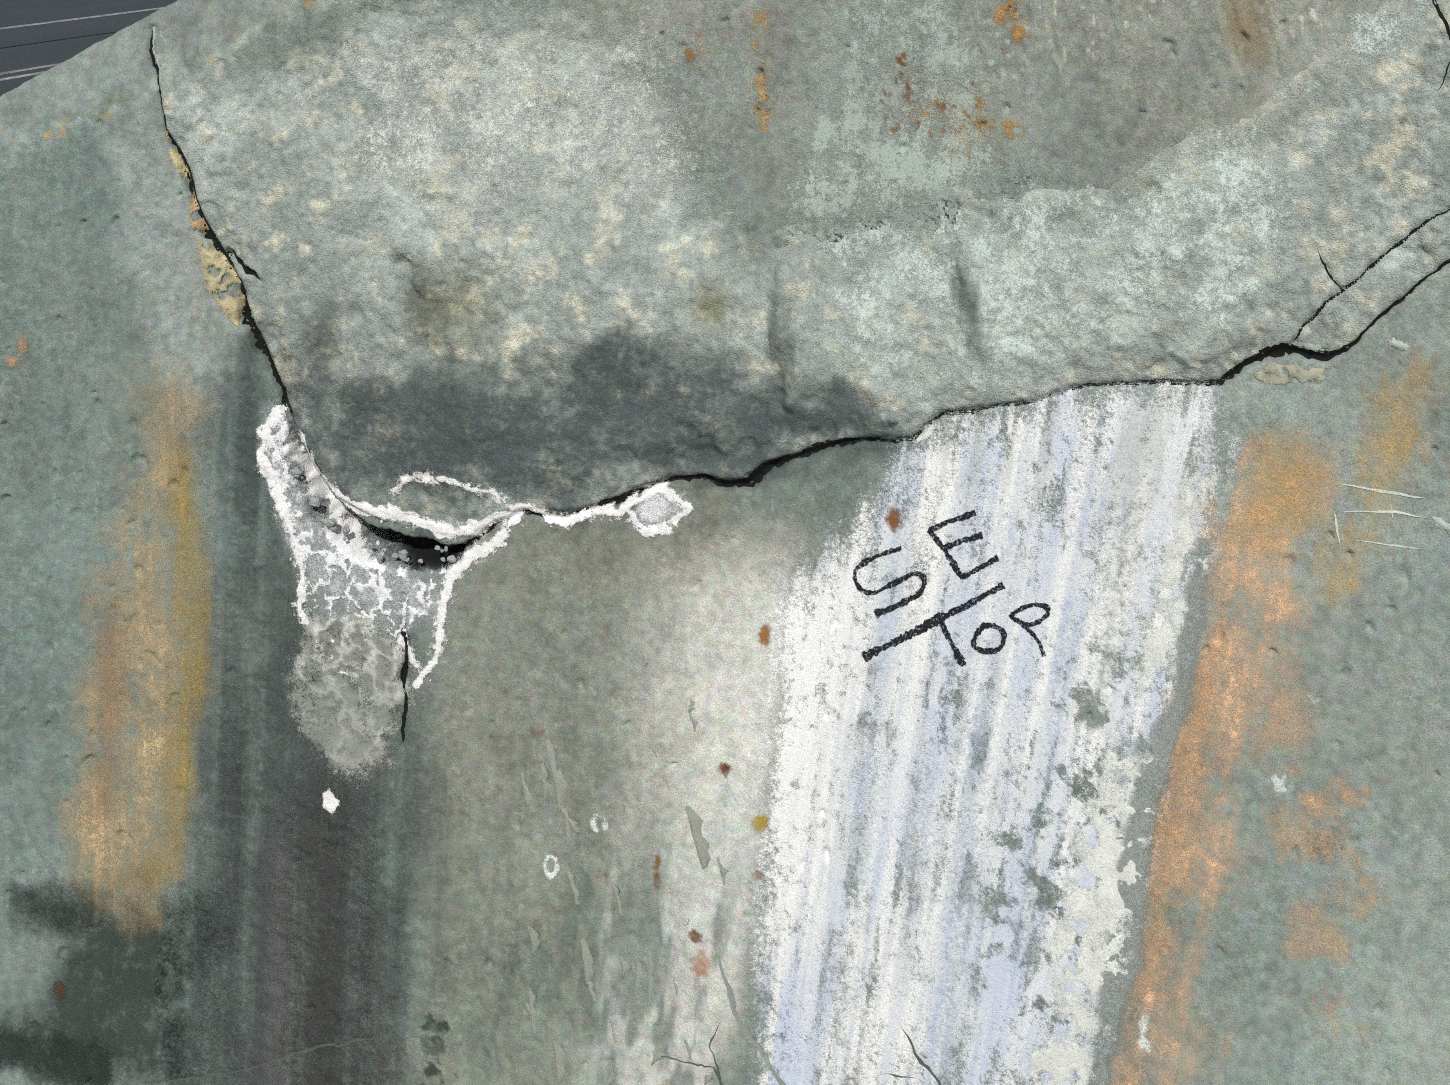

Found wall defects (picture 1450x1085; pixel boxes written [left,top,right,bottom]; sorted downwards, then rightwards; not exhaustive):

damp [1282,0,1439,109]
crack [1432,0,1450,90]
crack [149,29,295,422]
crack [466,209,1450,546]
damp [213,0,1309,1085]
corrosion [1220,467,1302,623]
corrosion [69,518,206,908]
crack [400,615,409,742]
corrosion [1169,621,1266,808]
corrosion [1159,826,1231,897]
damp [0,893,220,1085]
crack [890,1027,941,1085]